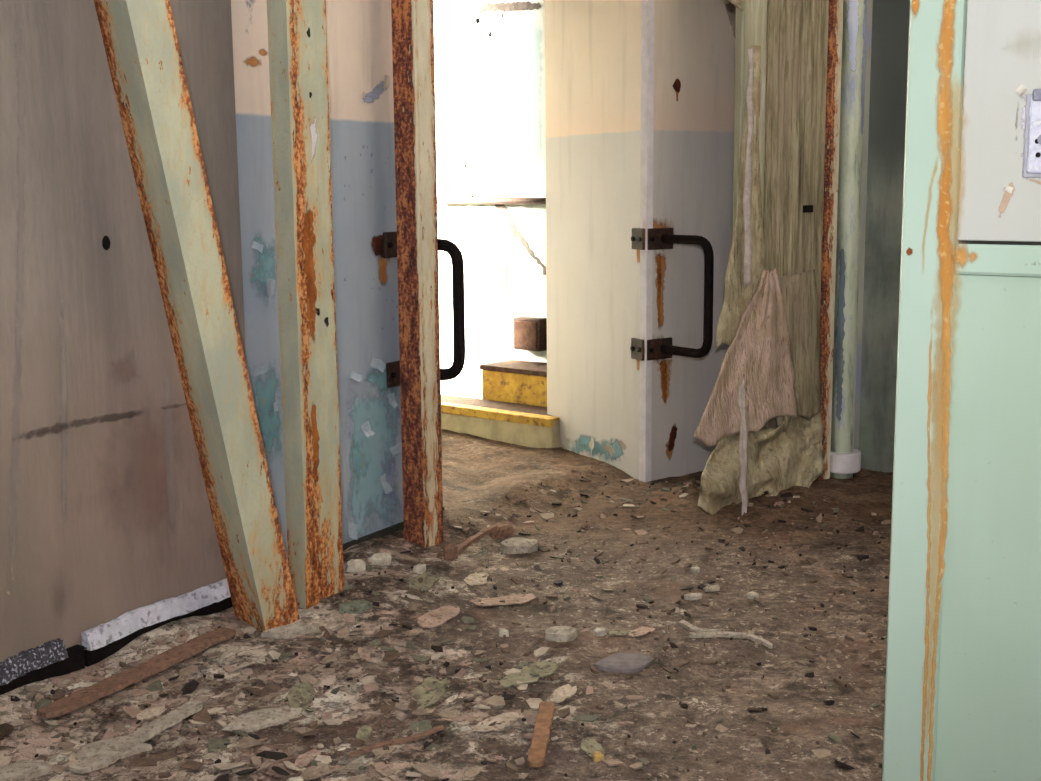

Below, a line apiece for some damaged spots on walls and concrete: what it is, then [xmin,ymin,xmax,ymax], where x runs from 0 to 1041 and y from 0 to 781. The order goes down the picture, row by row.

corrosion [246,49,267,67]
crack [446,104,546,275]
corrosion [302,209,317,341]
corrosion [660,360,672,402]
corrosion [920,0,976,781]
corrosion [311,405,319,484]
peeling [348,354,402,540]
peeling [562,436,627,460]
corrosion [666,425,678,460]